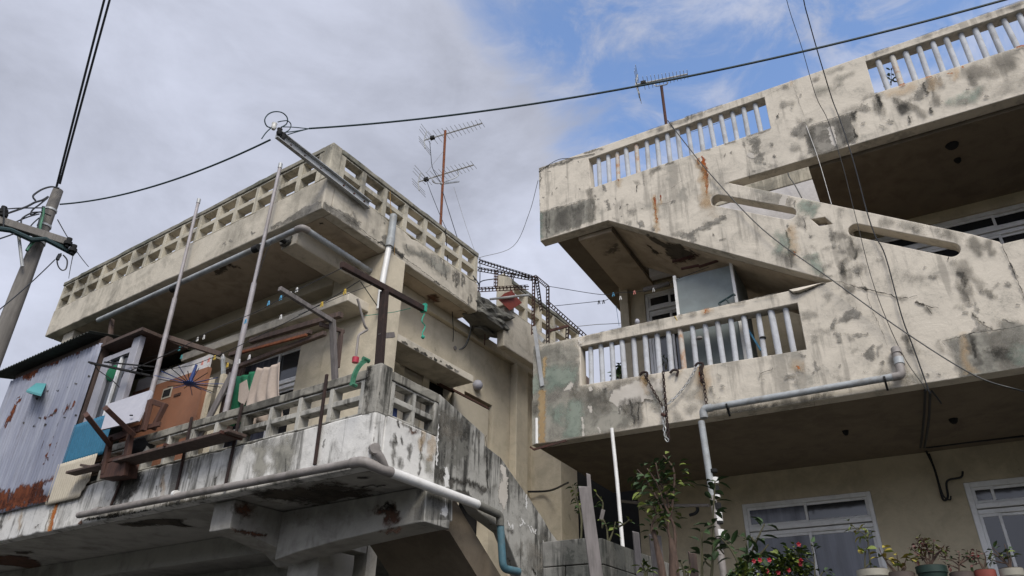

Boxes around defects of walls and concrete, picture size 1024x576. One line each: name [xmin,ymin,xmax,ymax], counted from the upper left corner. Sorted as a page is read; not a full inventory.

leakage [851,77,944,128]
leakage [965,56,1015,93]
corrosion [697,156,708,194]
peeling [539,169,726,264]
leakage [532,327,664,444]
leakage [391,420,487,497]
corrosion [0,476,58,532]